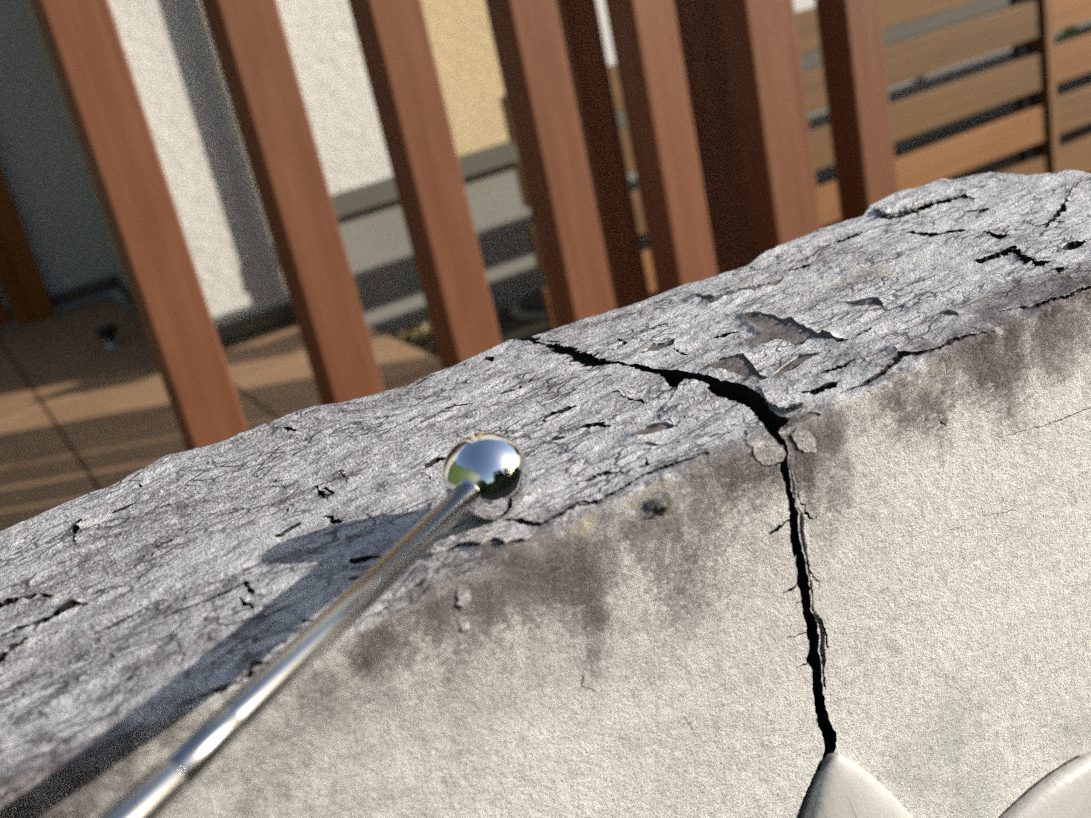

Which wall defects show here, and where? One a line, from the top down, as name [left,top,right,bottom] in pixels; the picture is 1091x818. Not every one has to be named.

crack [788,183,1091,395]
water stain [880,272,1091,442]
crack [0,586,114,662]
crack [71,519,82,542]
crack [93,581,255,633]
crack [177,619,314,706]
crack [274,470,359,538]
crack [343,555,381,582]
crack [419,457,446,482]
water stain [304,520,619,716]
crack [503,323,837,818]
water stain [627,404,851,598]